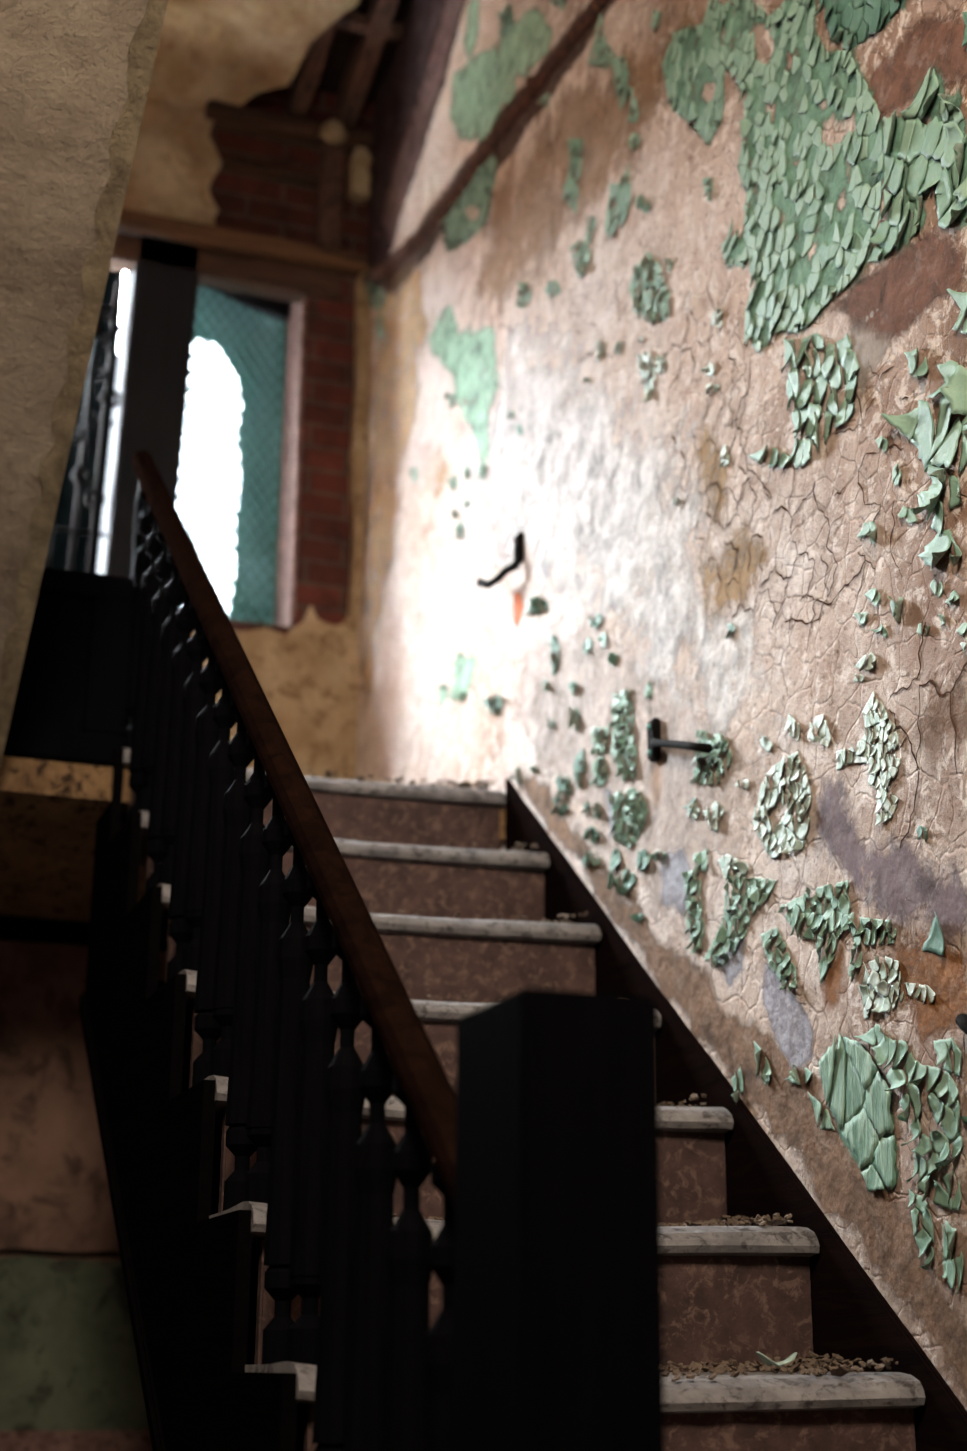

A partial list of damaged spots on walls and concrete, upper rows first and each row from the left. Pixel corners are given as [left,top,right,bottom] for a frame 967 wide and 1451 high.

spalling [368,0,650,295]
peeling [650,0,967,652]
peeling [428,252,967,1397]
crack [889,622,967,848]